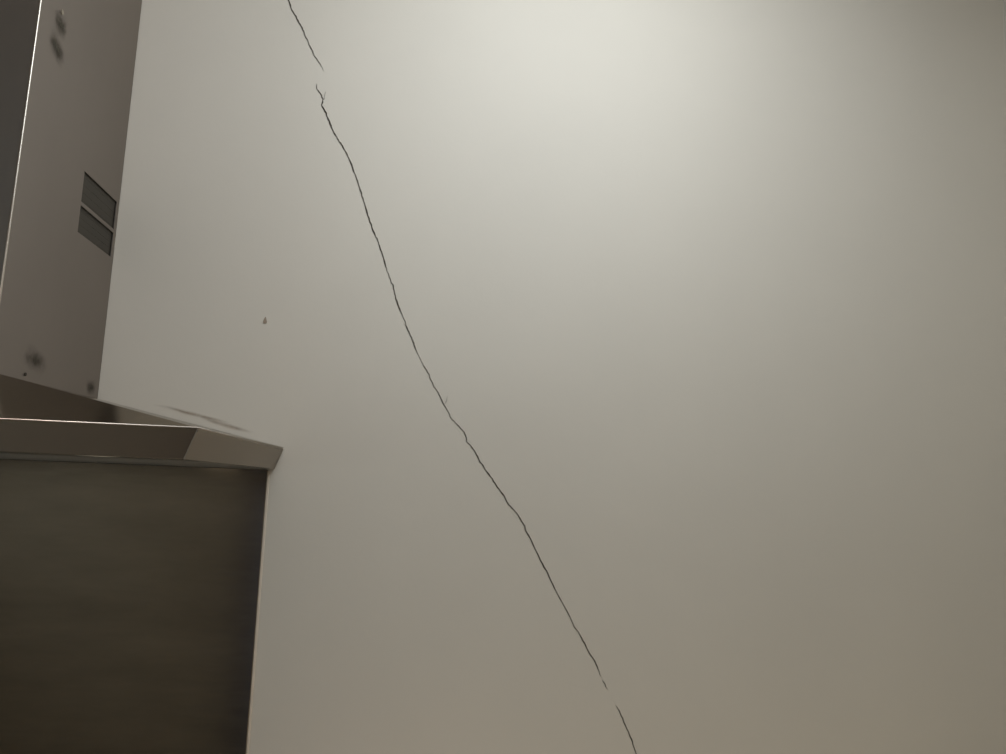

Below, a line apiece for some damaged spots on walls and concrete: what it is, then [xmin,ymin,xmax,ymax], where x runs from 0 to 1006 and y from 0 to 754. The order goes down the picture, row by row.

crack [288,0,636,753]